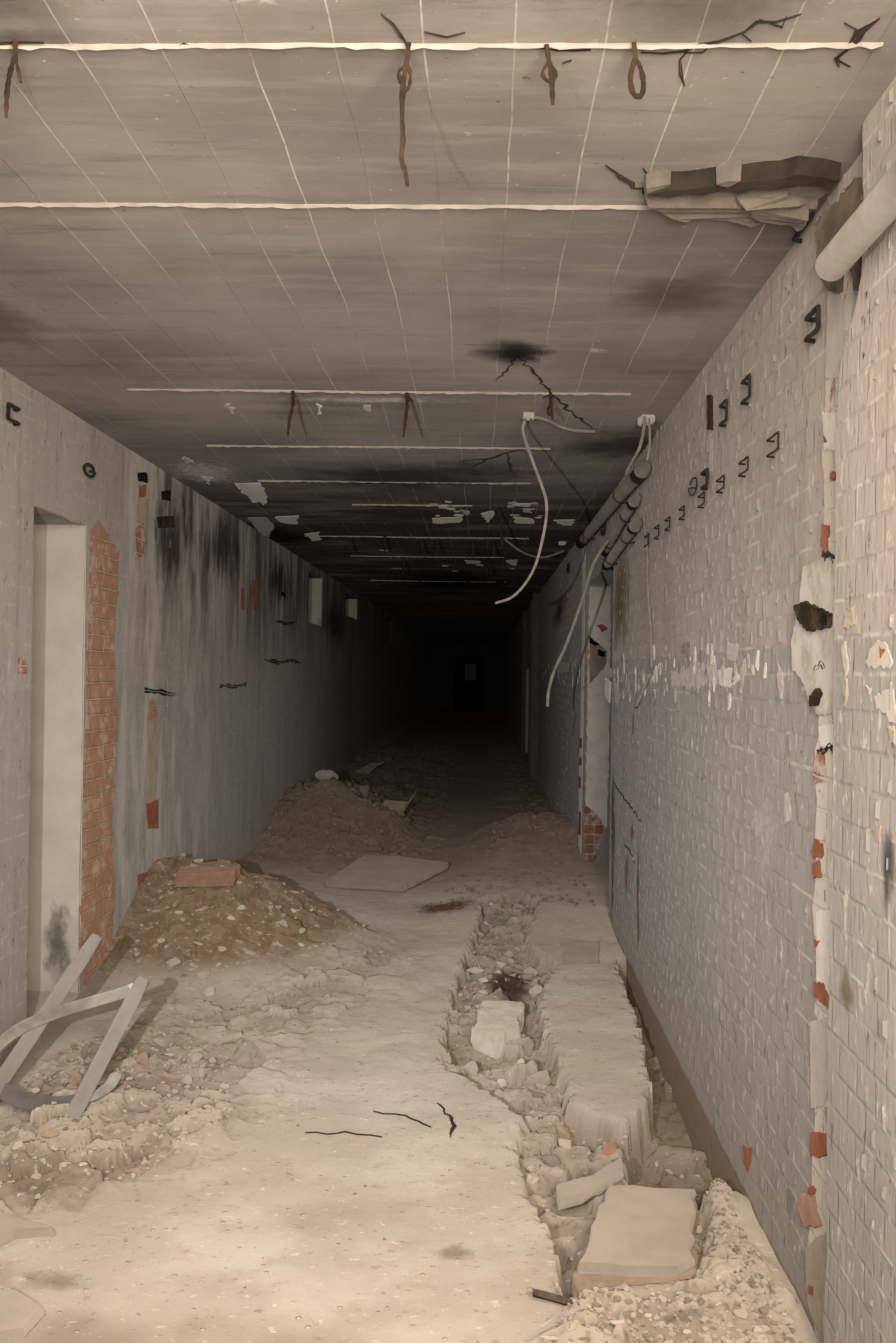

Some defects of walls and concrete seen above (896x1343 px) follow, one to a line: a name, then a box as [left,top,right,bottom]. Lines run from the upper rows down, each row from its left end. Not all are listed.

crack [641,13,801,87]
crack [834,17,880,68]
spalling [643,155,863,260]
spalling [820,256,862,294]
crack [496,360,594,429]
flaking render [135,472,175,560]
peeling [430,501,575,526]
spalling [793,601,855,706]
peeling [543,546,784,862]
flaking render [78,520,119,985]
flaking render [811,839,824,879]
crack [305,1102,457,1138]